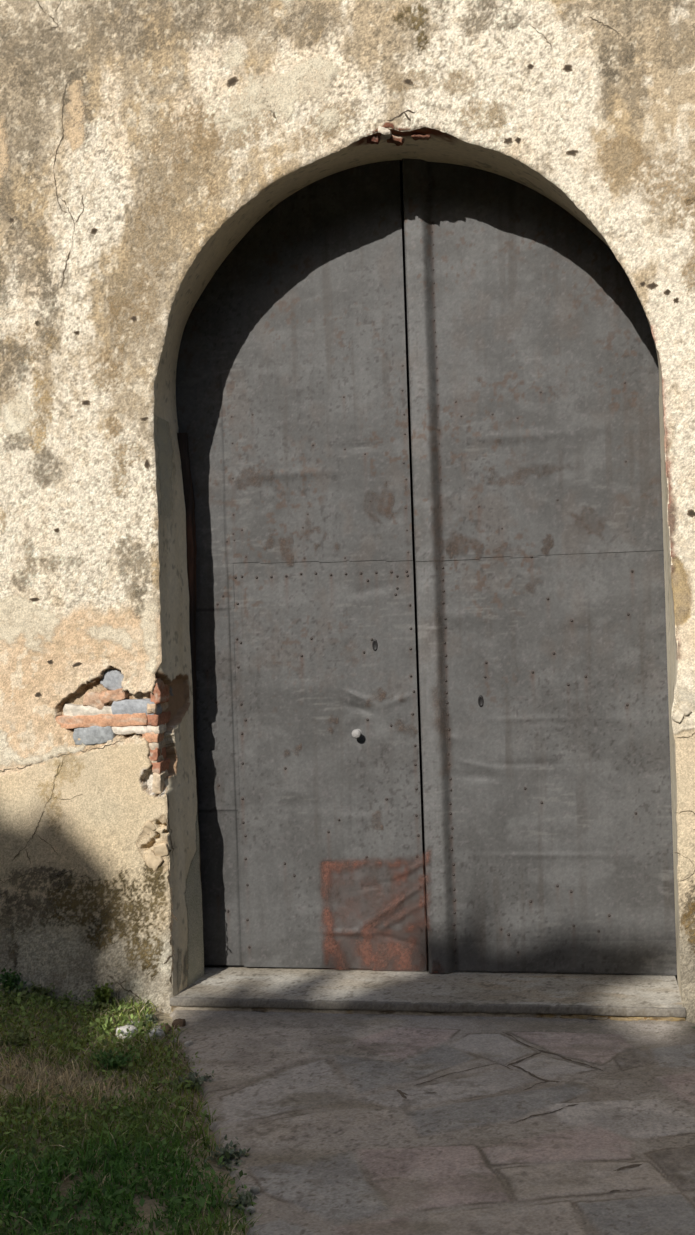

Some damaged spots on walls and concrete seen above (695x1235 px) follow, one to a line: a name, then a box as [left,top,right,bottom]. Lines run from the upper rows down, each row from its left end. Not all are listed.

damp [601,45,695,238]
damp [0,80,60,485]
damp [682,257,695,291]
damp [106,418,142,497]
damp [157,417,173,516]
flaking render [0,595,176,796]
crack [0,741,121,886]
flaking render [136,815,171,874]
damp [0,866,75,968]
damp [681,880,695,947]